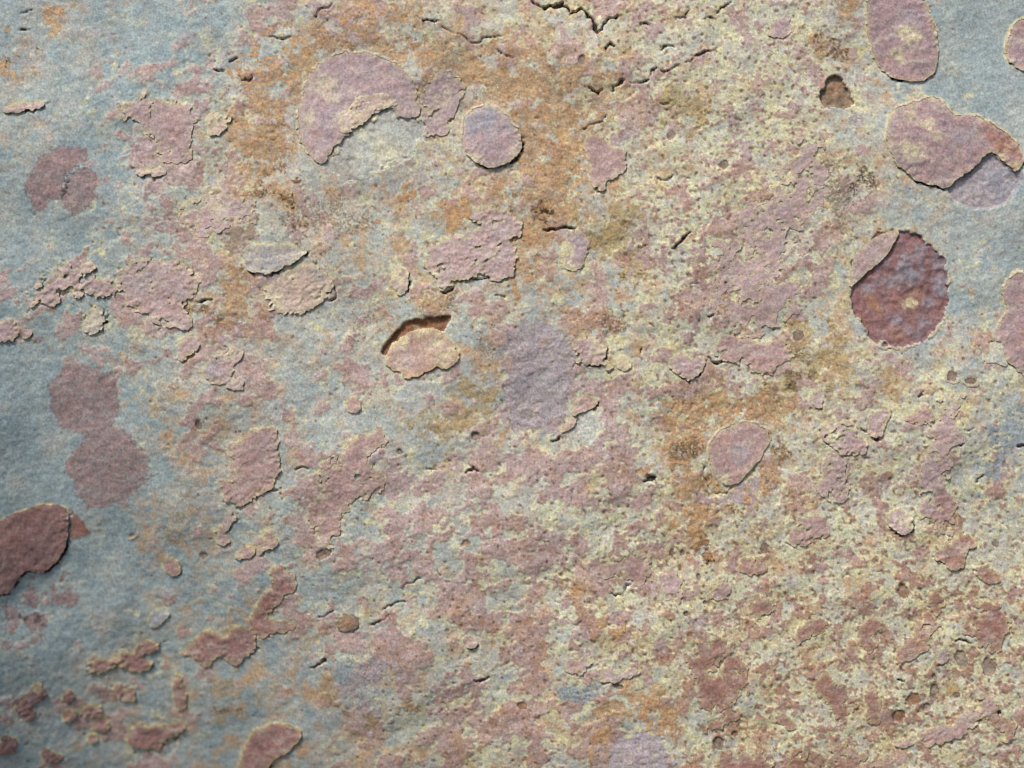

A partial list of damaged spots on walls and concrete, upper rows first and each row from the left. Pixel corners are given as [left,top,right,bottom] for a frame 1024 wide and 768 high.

peeling [864,0,939,82]
peeling [295,48,525,183]
corrosion [182,0,656,347]
spalling [820,75,854,109]
peeling [884,95,1024,210]
corrosion [409,281,503,364]
spalling [849,229,951,351]
peeling [984,267,1024,376]
peeling [706,419,772,487]
peeling [0,504,69,596]
peeling [238,723,302,768]